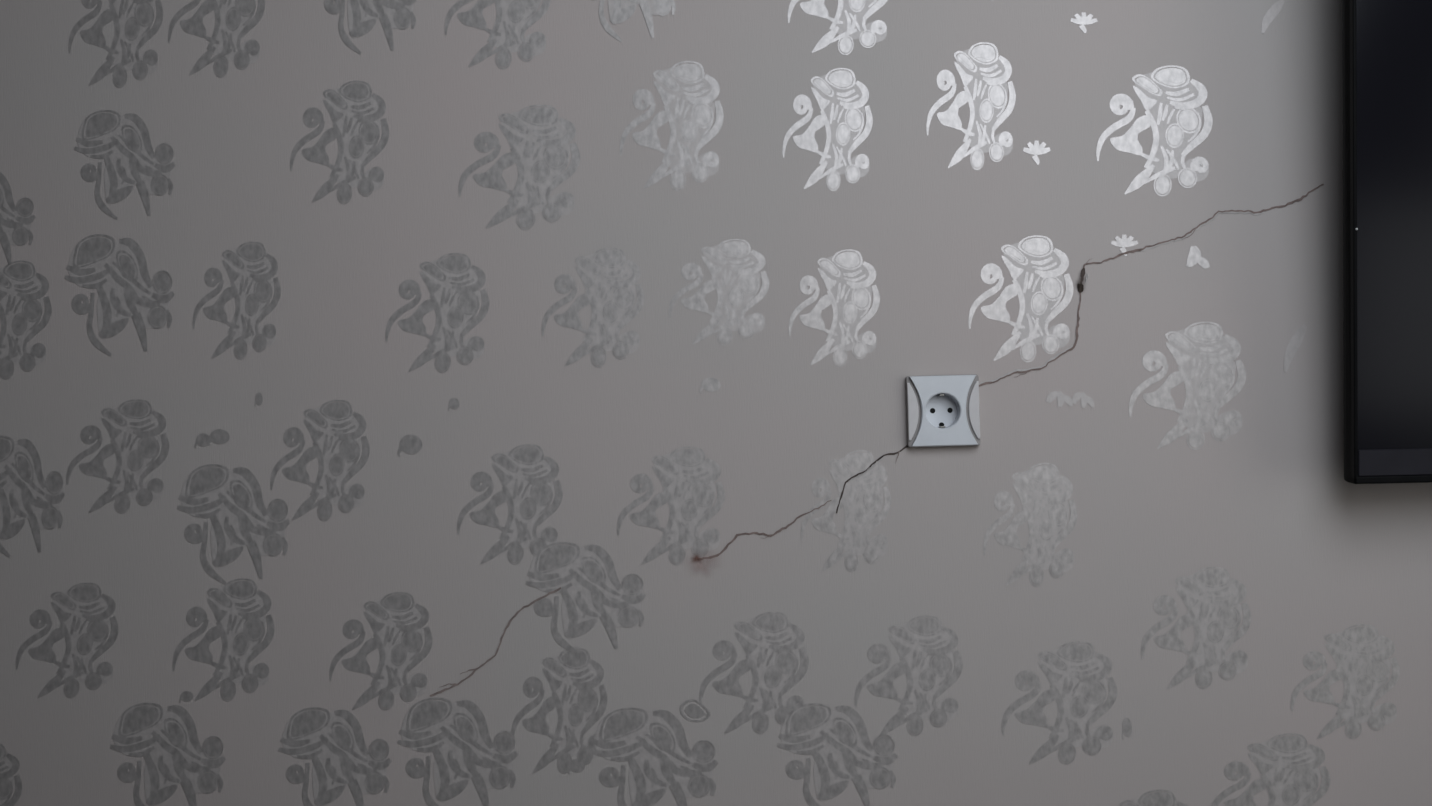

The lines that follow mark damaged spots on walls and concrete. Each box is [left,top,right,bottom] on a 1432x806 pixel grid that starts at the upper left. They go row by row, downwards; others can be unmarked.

crack [979,184,1324,387]
crack [698,445,908,561]
crack [430,587,561,696]